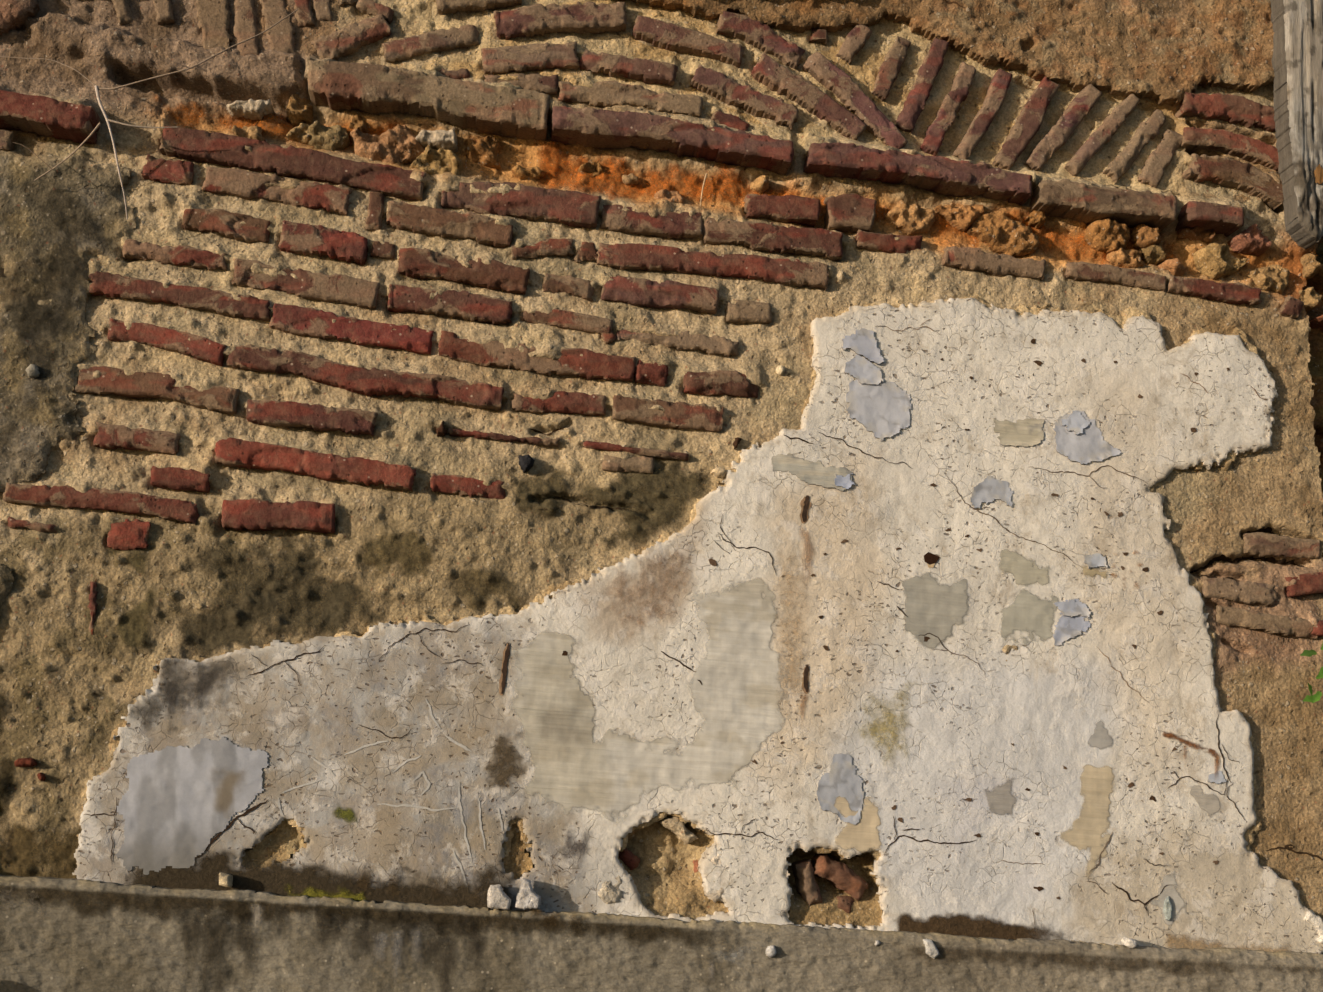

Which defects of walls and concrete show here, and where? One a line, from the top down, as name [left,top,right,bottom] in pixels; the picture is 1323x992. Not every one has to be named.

crack [1190,527,1304,582]
leakage [117,589,153,649]
leakage [128,536,382,726]
peeling [115,737,269,875]
crack [195,800,268,858]
leakage [0,758,707,992]
leakage [486,737,522,787]
spalling [487,824,541,910]
peeling [509,578,788,919]
spalling [786,753,904,946]
crack [884,816,1044,865]
crack [1171,714,1246,821]